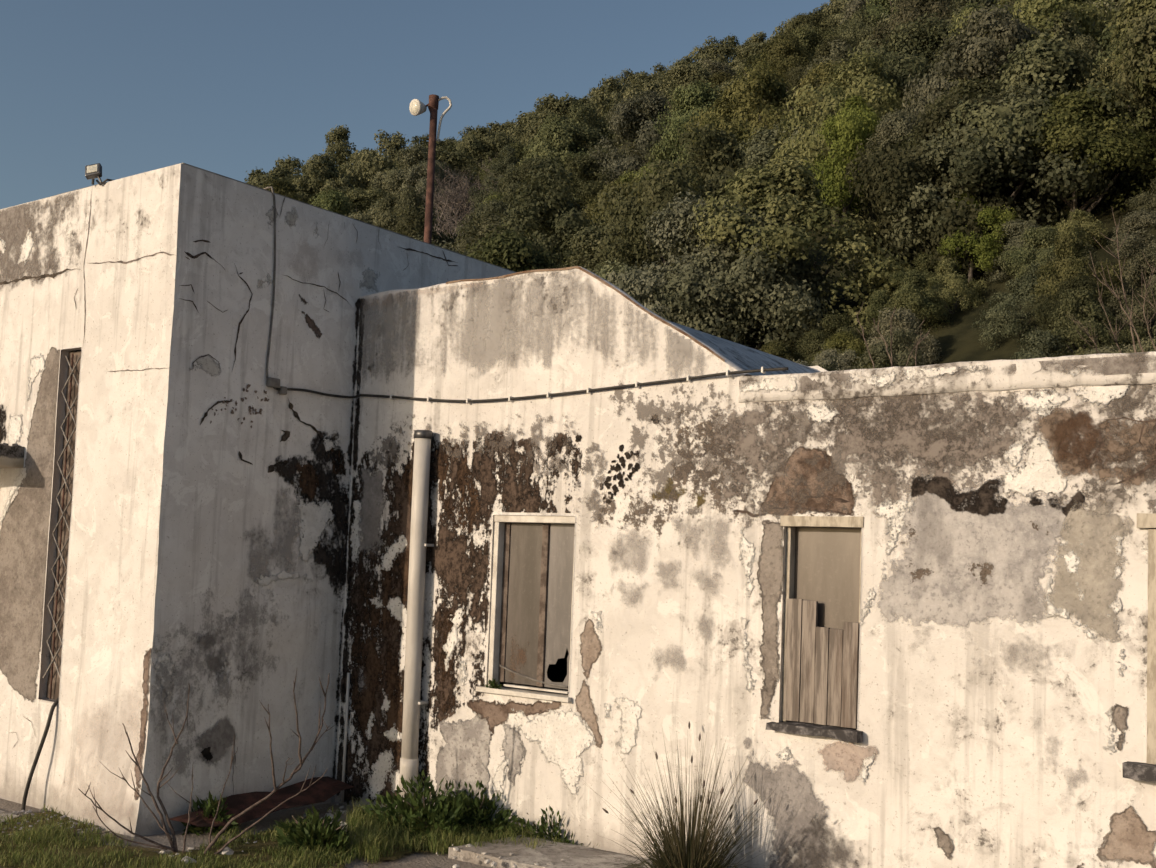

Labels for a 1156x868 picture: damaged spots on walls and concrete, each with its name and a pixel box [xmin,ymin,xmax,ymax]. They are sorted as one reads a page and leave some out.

crack [0,191,253,370]
crack [108,366,163,374]
crack [200,400,231,425]
crack [239,399,329,473]
crack [284,273,352,312]
water stain [441,272,613,372]
peeling [1000,436,1069,497]
spalling [0,347,60,703]
water stain [246,291,1156,805]
spalling [1043,501,1133,685]
peeling [435,604,642,800]
spalling [1096,805,1156,868]